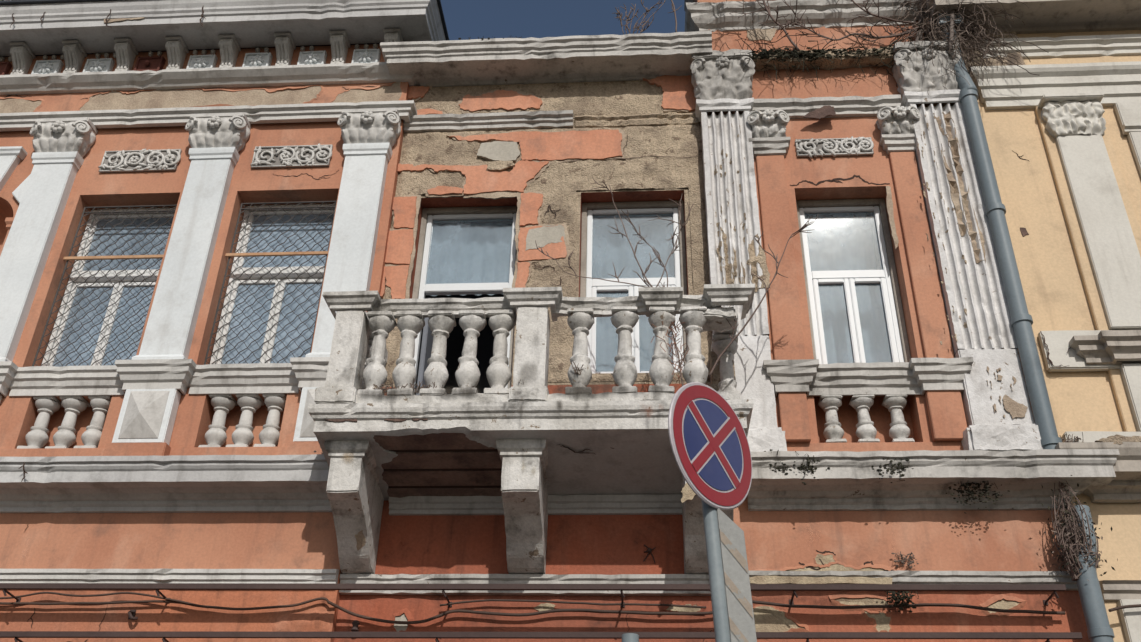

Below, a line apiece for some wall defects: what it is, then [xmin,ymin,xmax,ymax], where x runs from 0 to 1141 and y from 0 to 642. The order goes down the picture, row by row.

peeling [78,82,546,115]
peeling [643,75,696,113]
peeling [380,129,626,299]
peeling [714,149,771,292]
crack [791,175,890,186]
peeling [912,111,986,264]
peeling [987,366,1028,419]
spalling [370,419,502,499]
spalling [681,483,696,503]
peeling [753,605,810,640]
peeling [749,552,900,632]
peeling [979,593,1027,618]